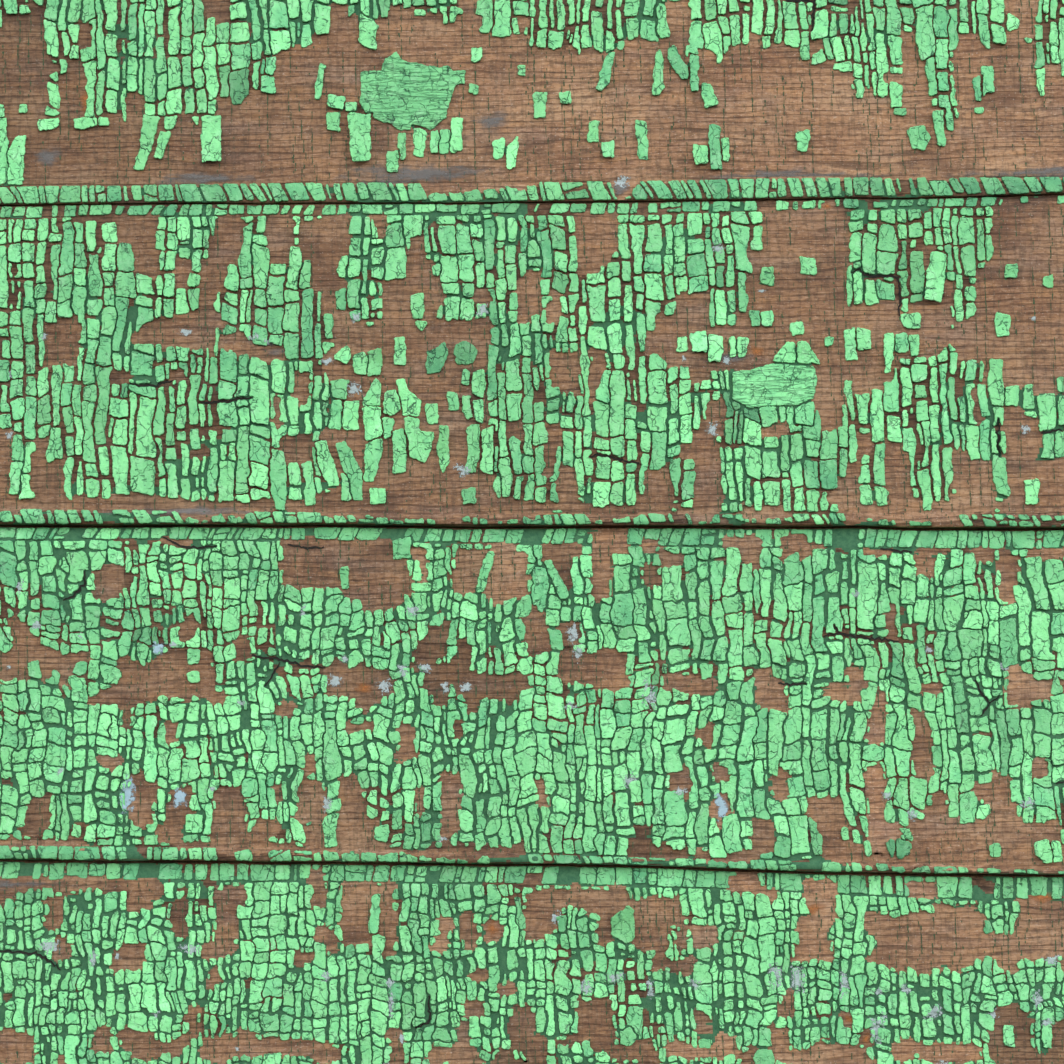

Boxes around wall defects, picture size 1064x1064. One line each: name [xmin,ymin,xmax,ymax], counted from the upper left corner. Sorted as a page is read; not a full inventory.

crack [786,0,816,31]
peeling [0,0,1064,277]
crack [851,268,902,316]
crack [201,396,252,404]
peeling [0,200,1064,698]
crack [590,453,640,464]
peeling [0,613,230,732]
peeling [410,621,533,739]
crack [824,624,899,642]
peeling [804,708,1064,976]
crack [0,950,61,970]
peeling [424,967,877,1064]